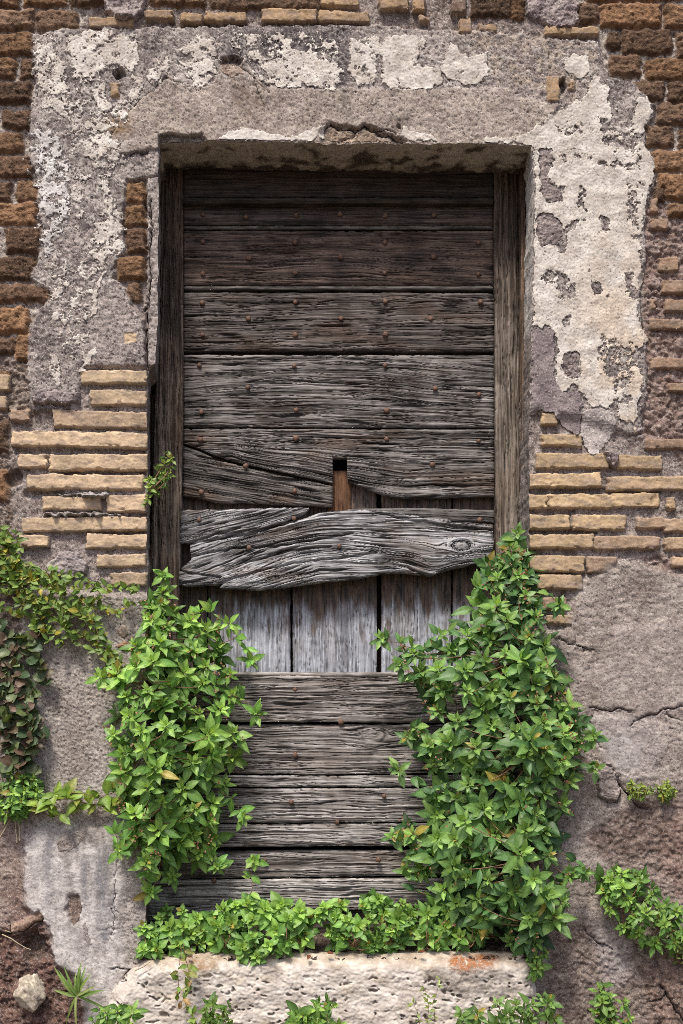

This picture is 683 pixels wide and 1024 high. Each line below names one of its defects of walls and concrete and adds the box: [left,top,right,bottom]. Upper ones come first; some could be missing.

peeling [23,27,490,387]
peeling [483,53,655,455]
crack [590,707,680,748]